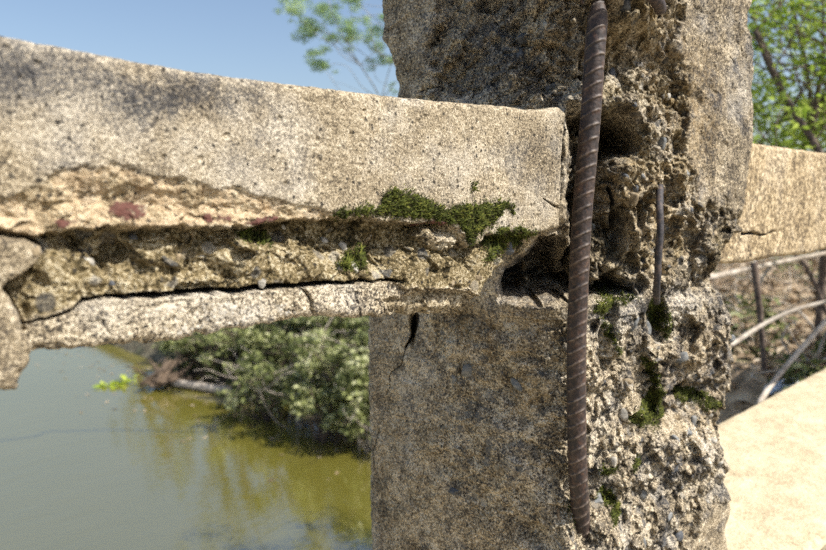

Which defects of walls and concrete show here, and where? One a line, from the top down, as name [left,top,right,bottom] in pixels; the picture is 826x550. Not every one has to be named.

crack [47,278,400,319]
spalling [0,162,522,322]
crack [388,313,420,390]
spalling [414,0,743,550]